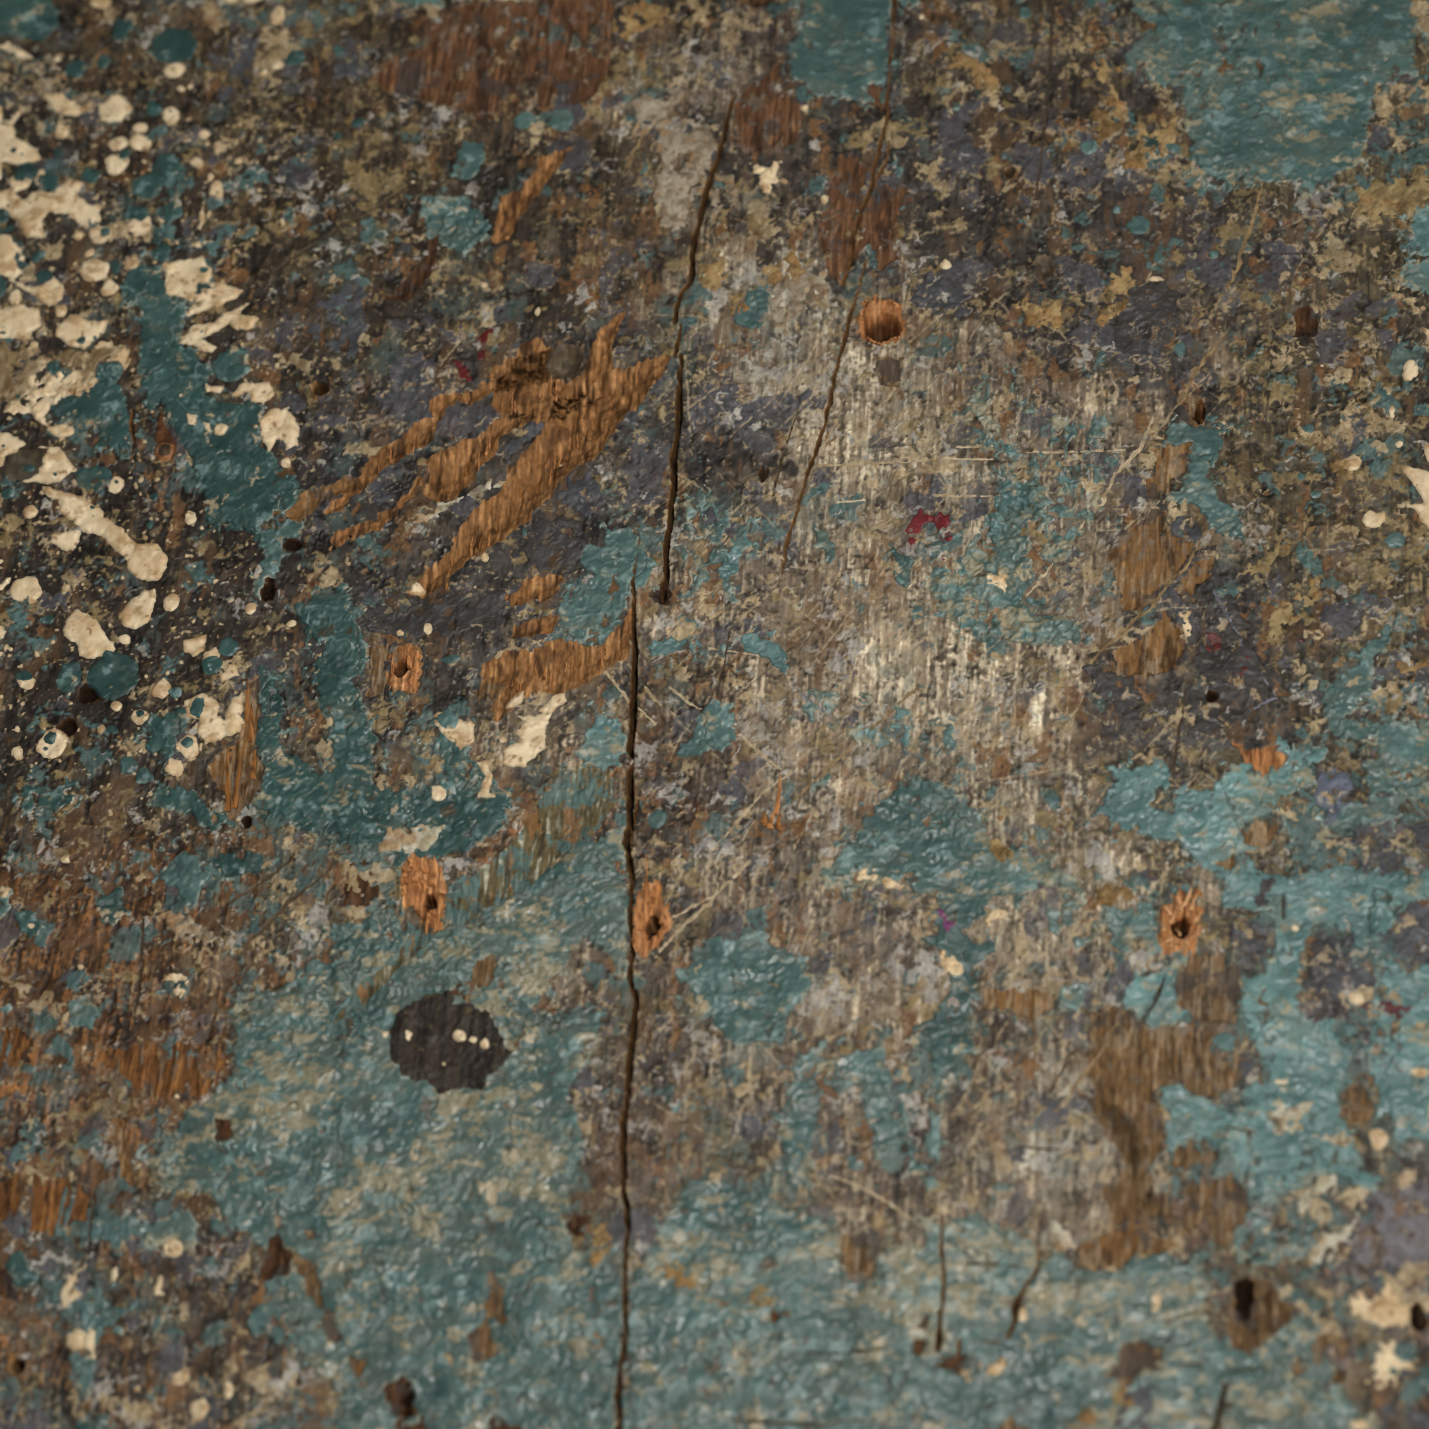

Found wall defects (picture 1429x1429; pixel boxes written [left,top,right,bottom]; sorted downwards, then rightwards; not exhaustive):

peeling [330,0,618,119]
crack [772,0,897,583]
peeling [0,336,141,460]
peeling [10,776,83,830]
crack [614,92,736,1429]
peeling [90,248,1429,1429]
peeling [0,888,45,939]
peeling [0,1003,32,1078]
peeling [67,995,98,1029]
peeling [0,1173,90,1236]
peeling [67,1280,142,1429]